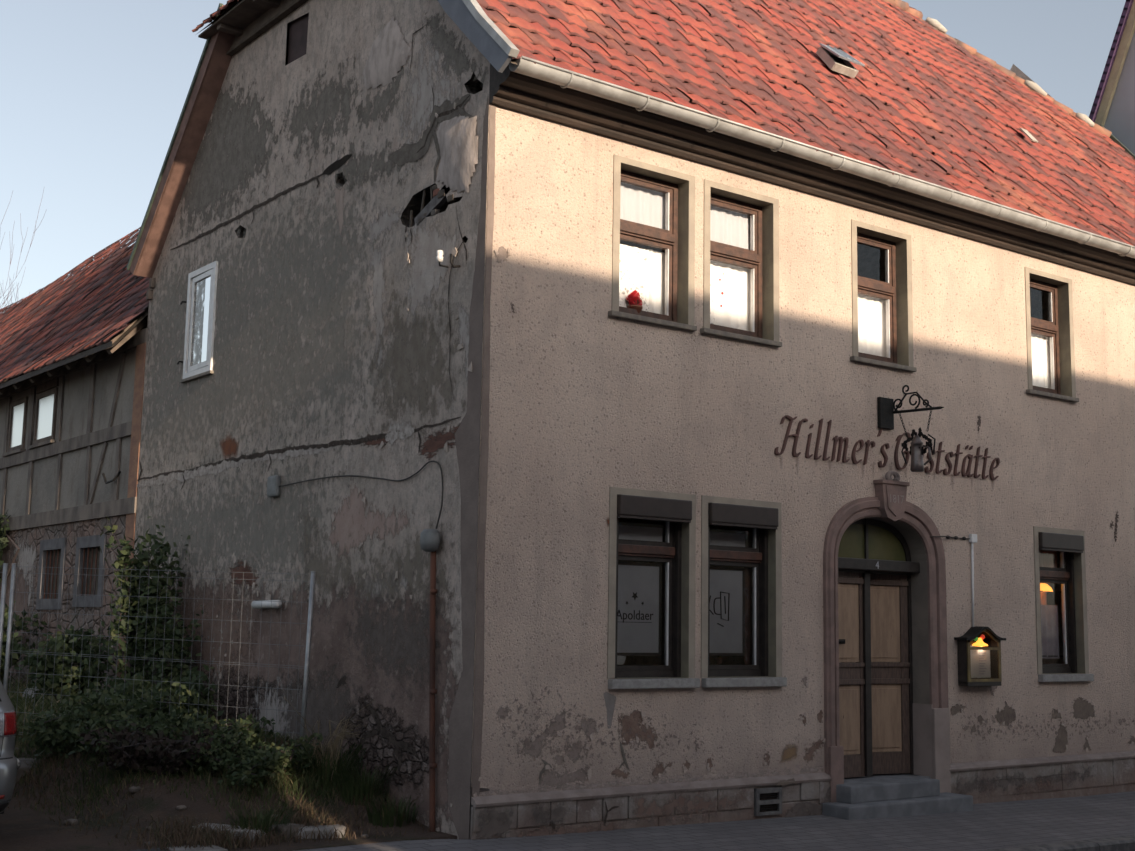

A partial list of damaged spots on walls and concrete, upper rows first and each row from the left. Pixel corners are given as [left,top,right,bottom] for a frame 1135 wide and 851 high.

crack [388,26,477,183]
peeling [399,24,483,144]
crack [171,154,352,250]
peeling [400,183,462,322]
crack [137,208,467,491]
flaking render [420,423,461,460]
flaking render [159,560,462,832]
spalling [521,692,657,767]
spalling [951,701,1016,733]
spalling [1052,697,1097,753]